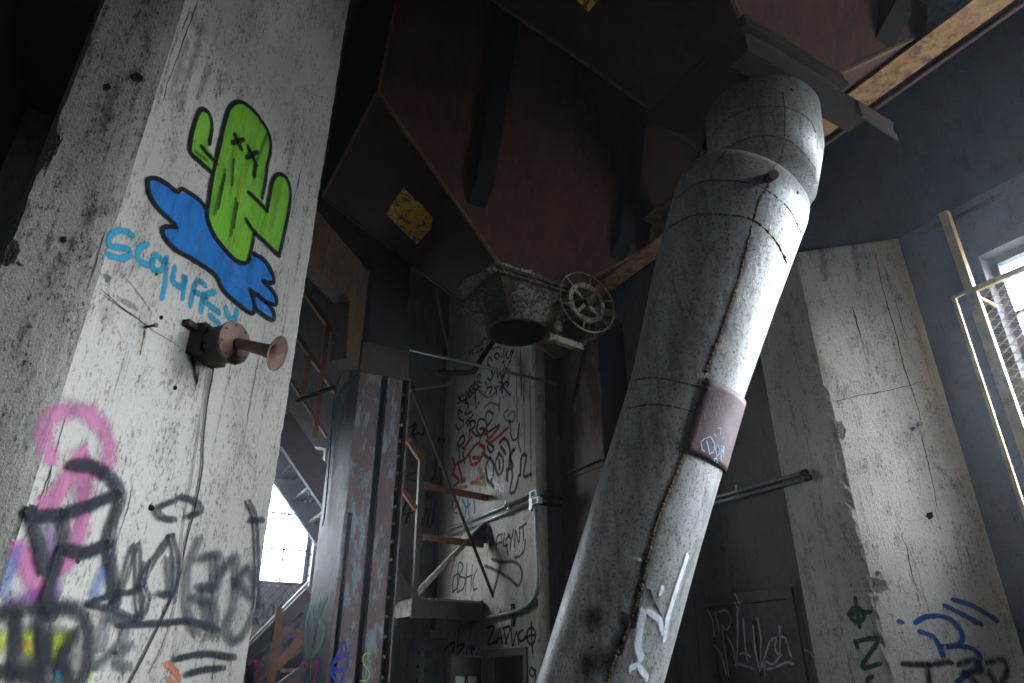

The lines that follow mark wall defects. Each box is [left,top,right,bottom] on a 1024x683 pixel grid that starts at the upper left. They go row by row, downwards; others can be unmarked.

corrosion [703,235,752,373]
spalling [833,420,846,441]
crack [839,255,939,512]
corrosion [646,451,686,565]
spalling [867,571,889,600]